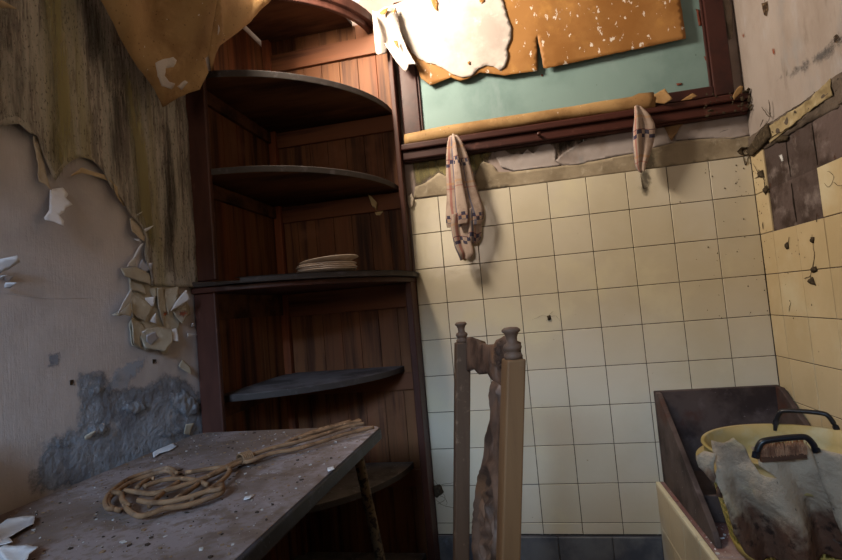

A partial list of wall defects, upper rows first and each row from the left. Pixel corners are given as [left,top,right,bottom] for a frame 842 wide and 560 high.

peeling [155,57,188,90]
peeling [474,72,842,231]
peeling [44,188,73,226]
peeling [408,173,447,208]
peeling [0,256,20,288]
peeling [112,212,197,364]
peeling [153,443,176,457]